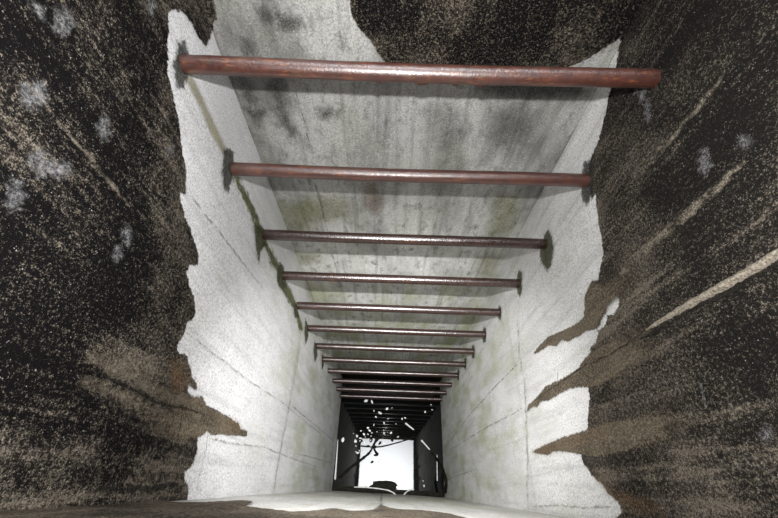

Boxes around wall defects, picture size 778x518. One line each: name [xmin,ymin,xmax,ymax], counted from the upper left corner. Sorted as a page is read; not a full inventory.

water stain [478,85,582,98]
water stain [254,224,266,261]
water stain [539,230,553,271]